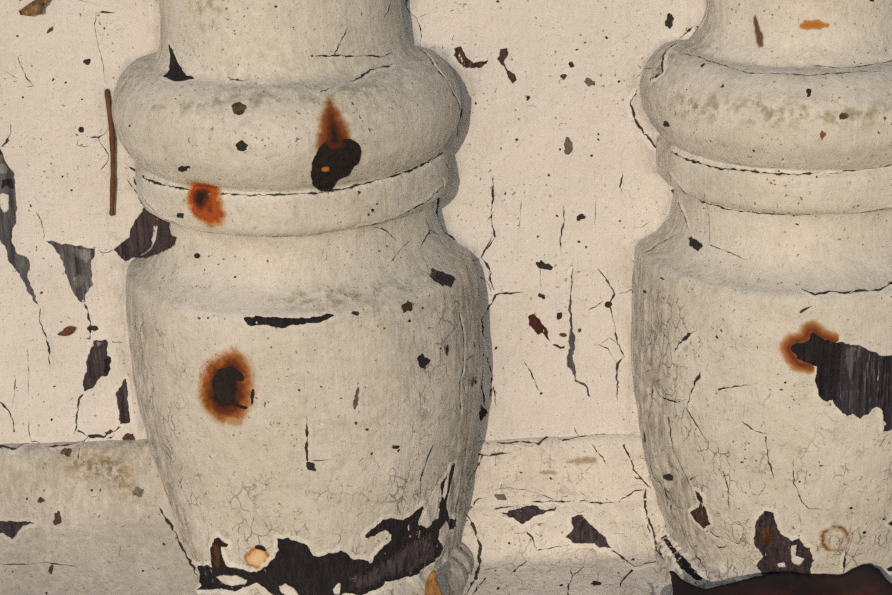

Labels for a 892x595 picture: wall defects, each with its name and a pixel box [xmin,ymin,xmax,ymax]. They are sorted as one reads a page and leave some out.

corrosion [800,20,829,30]
corrosion [311,99,361,192]
peeling [0,132,43,310]
peeling [40,237,100,306]
peeling [114,208,184,261]
corrosion [187,182,225,227]
corrosion [199,350,254,425]
crack [283,176,892,595]
corrosion [780,321,839,373]
peeling [791,332,892,436]
peeling [194,459,459,595]
peeling [750,507,818,576]